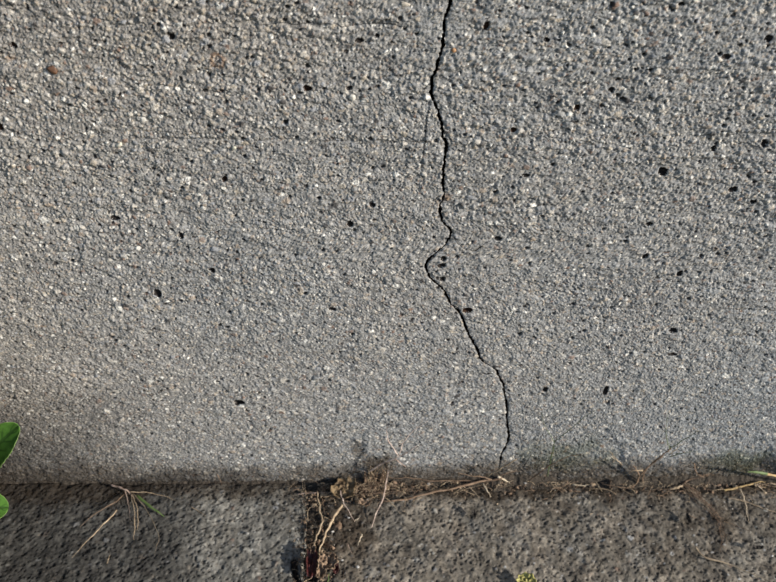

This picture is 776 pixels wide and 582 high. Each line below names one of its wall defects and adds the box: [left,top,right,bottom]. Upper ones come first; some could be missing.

crack [128,0,510,469]